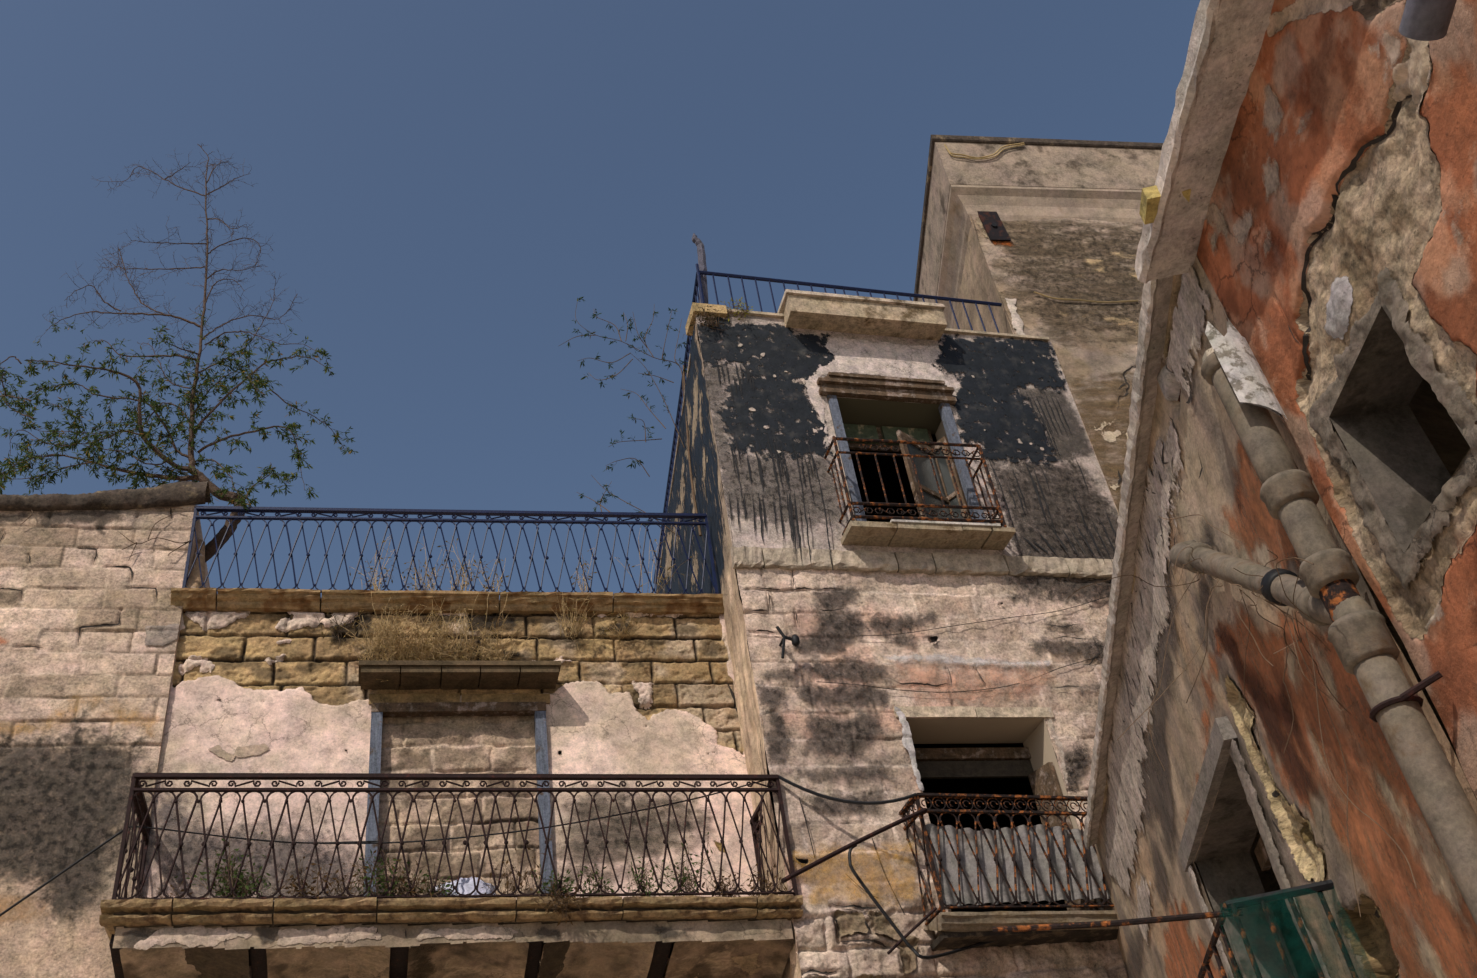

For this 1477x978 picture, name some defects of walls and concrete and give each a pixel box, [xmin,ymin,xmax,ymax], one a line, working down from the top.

water stain [717,362,755,402]
peeling [656,316,835,594]
water stain [993,219,1144,342]
peeling [1206,203,1272,255]
peeling [1224,441,1300,569]
crack [1273,95,1412,380]
flaking render [1263,0,1477,640]
water stain [0,713,365,917]
peeling [209,744,270,761]
flaking render [171,602,744,755]
peeling [1201,608,1477,978]